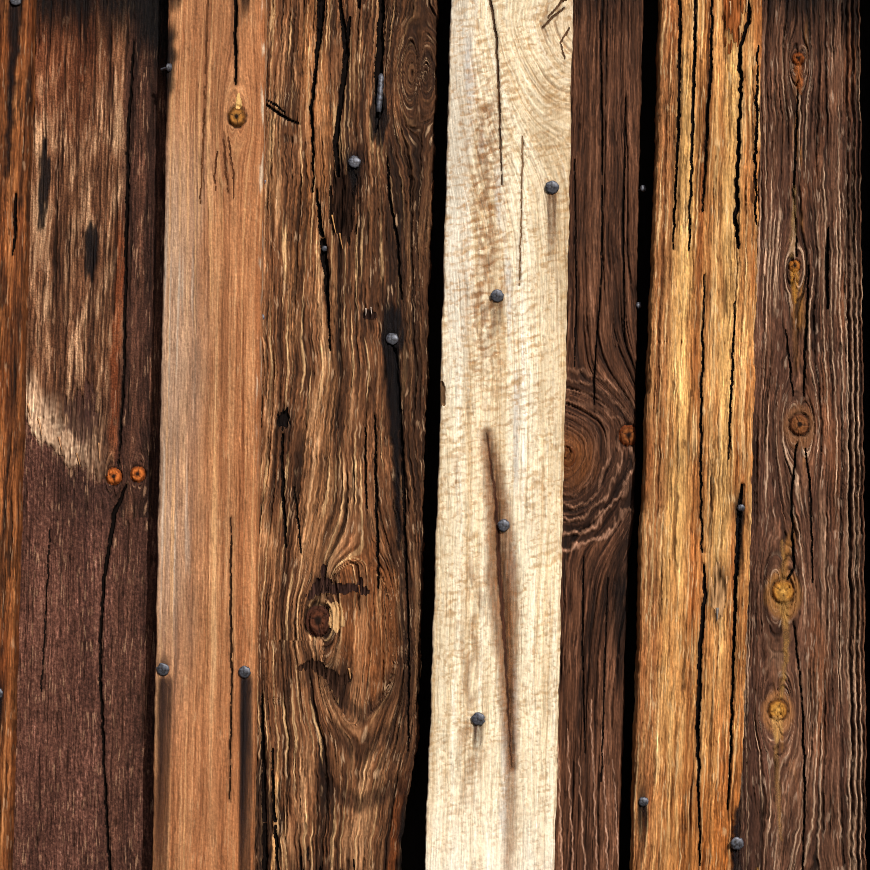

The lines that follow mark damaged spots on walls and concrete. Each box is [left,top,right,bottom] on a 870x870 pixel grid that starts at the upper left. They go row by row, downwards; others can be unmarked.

crack [266,0,385,351]
crack [386,158,403,300]
crack [489,0,524,286]
crack [672,0,714,251]
crack [733,0,760,249]
crack [98,41,135,870]
crack [695,274,707,866]
crack [728,301,736,460]
crack [727,484,743,809]